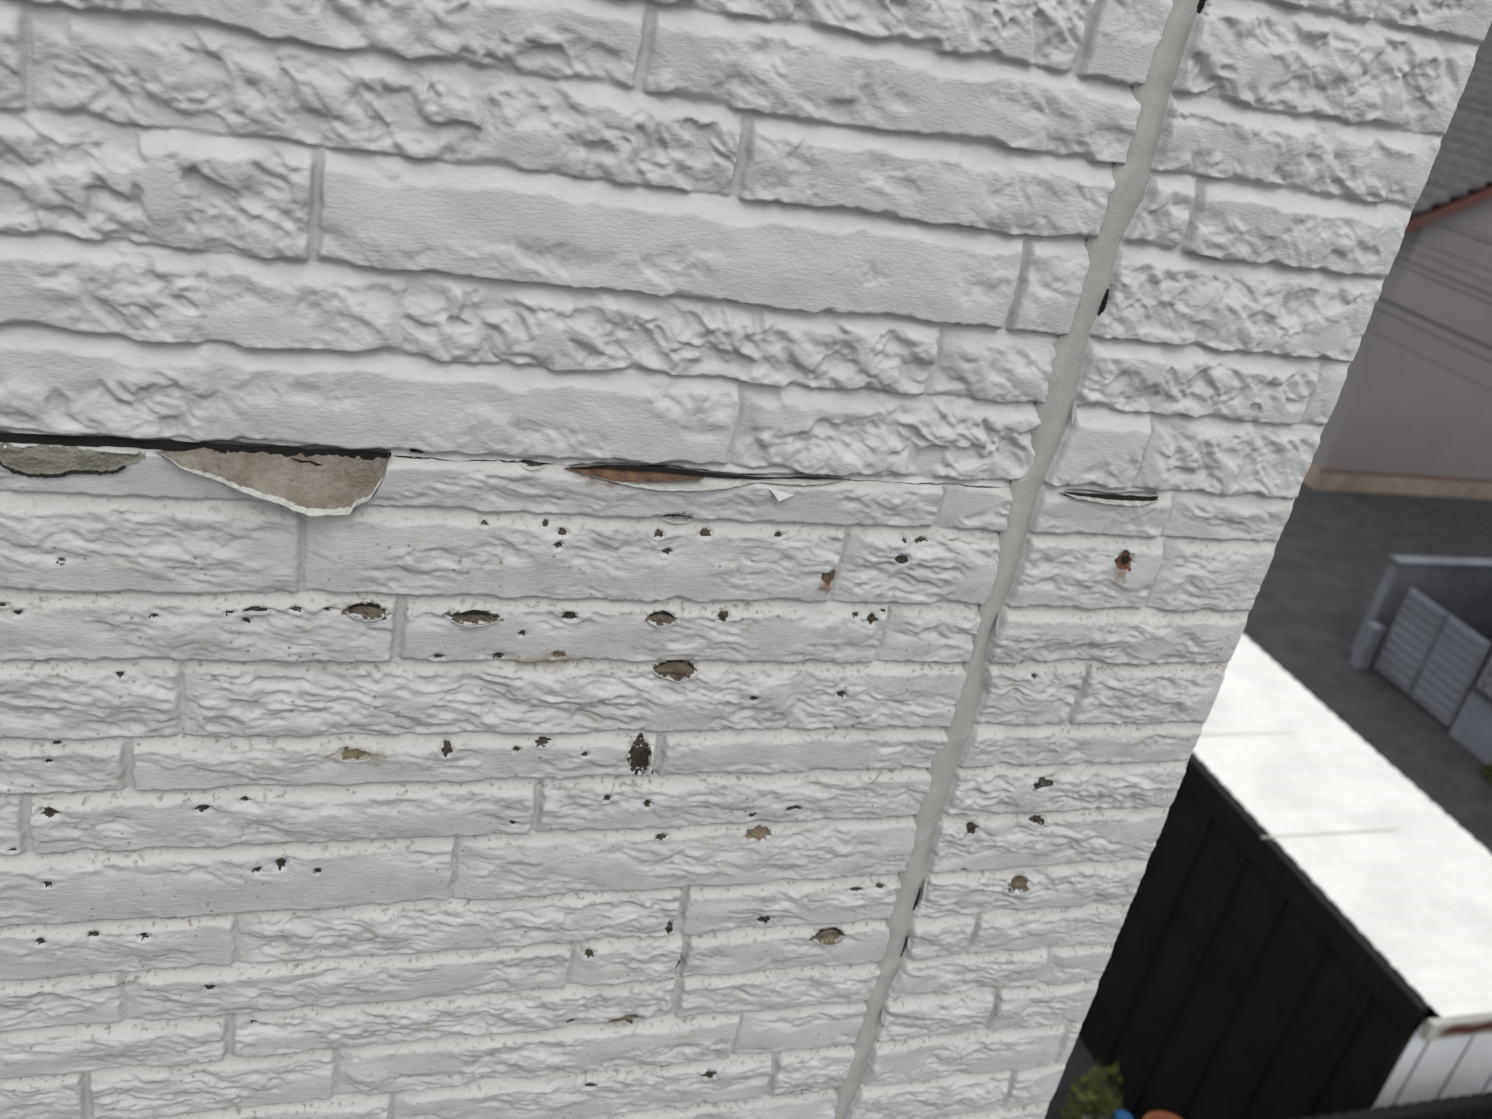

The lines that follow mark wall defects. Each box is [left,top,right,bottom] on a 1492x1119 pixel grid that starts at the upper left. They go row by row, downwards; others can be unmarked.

spalling [520,460,547,471]
peeling [0,442,389,516]
peeling [566,465,849,501]
peeling [1061,492,1159,506]
spalling [341,602,390,621]
spalling [442,609,504,627]
spalling [645,610,678,628]
spalling [653,660,700,683]
spalling [627,733,655,775]
spalling [809,927,847,947]